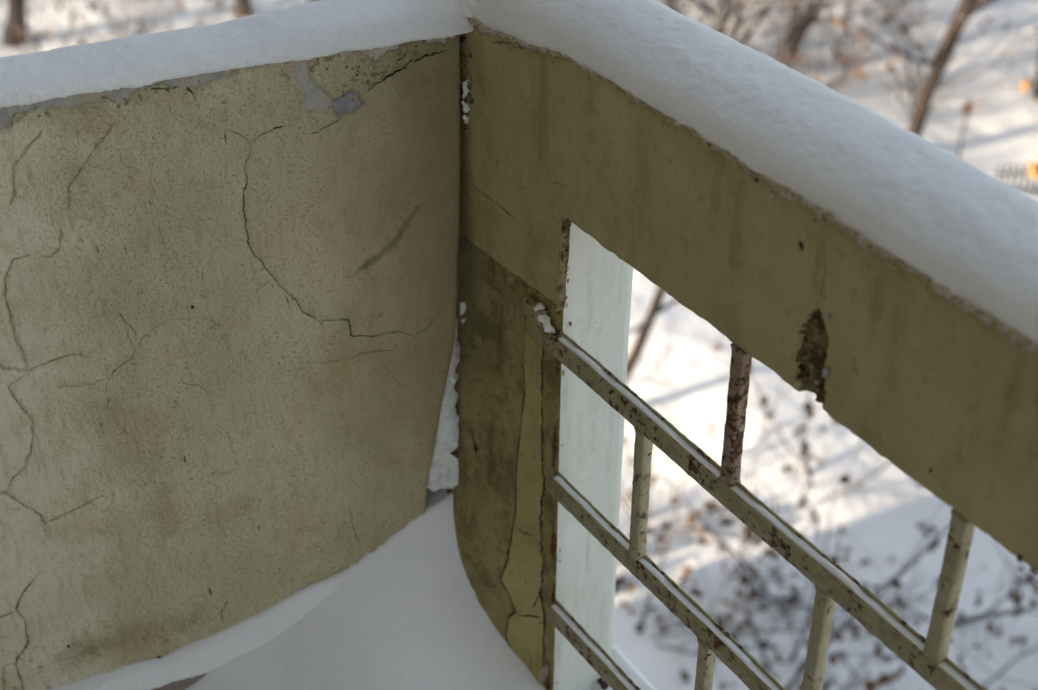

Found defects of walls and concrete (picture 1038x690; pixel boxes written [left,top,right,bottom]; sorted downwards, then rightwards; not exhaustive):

crack [150,86,196,100]
peeling [290,38,446,117]
crack [370,50,447,89]
spalling [460,18,1038,355]
crack [224,126,439,387]
crack [0,230,105,527]
crack [62,317,223,423]
crack [487,277,549,669]
crack [0,582,32,690]